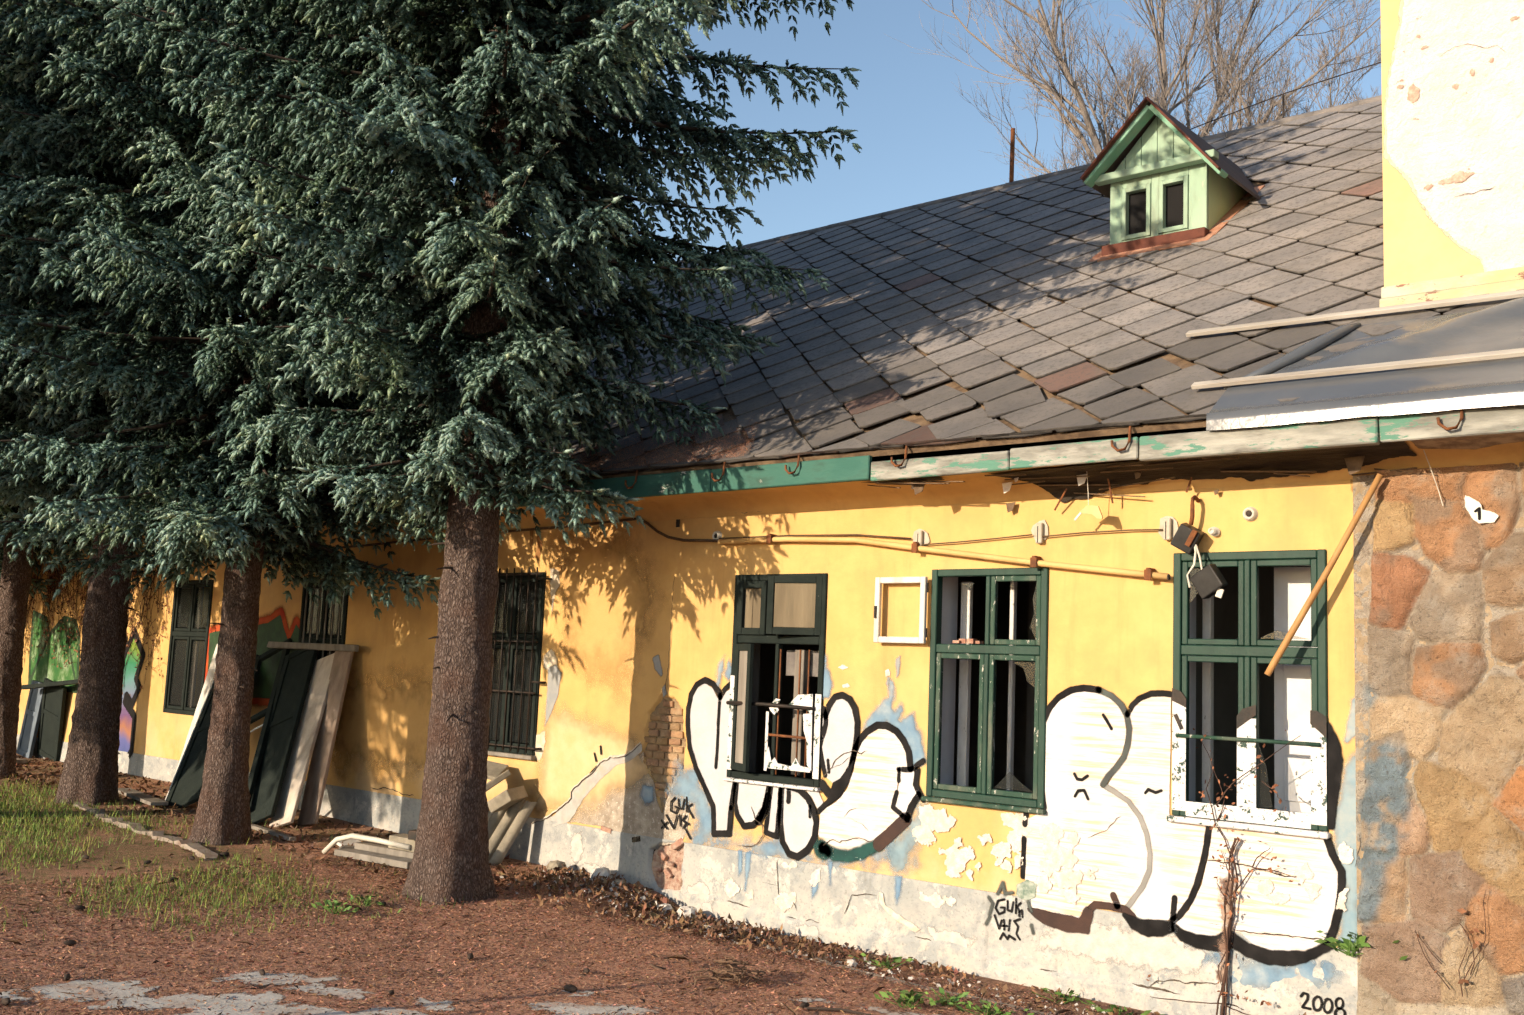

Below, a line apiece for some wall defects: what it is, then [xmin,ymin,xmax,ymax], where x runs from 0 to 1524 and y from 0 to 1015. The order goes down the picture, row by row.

flaking render [1383,0,1524,272]
peeling [1002,477,1019,512]
flaking render [1074,471,1103,521]
flaking render [544,696,689,846]
peeling [911,804,1031,881]
peeling [919,892,956,908]